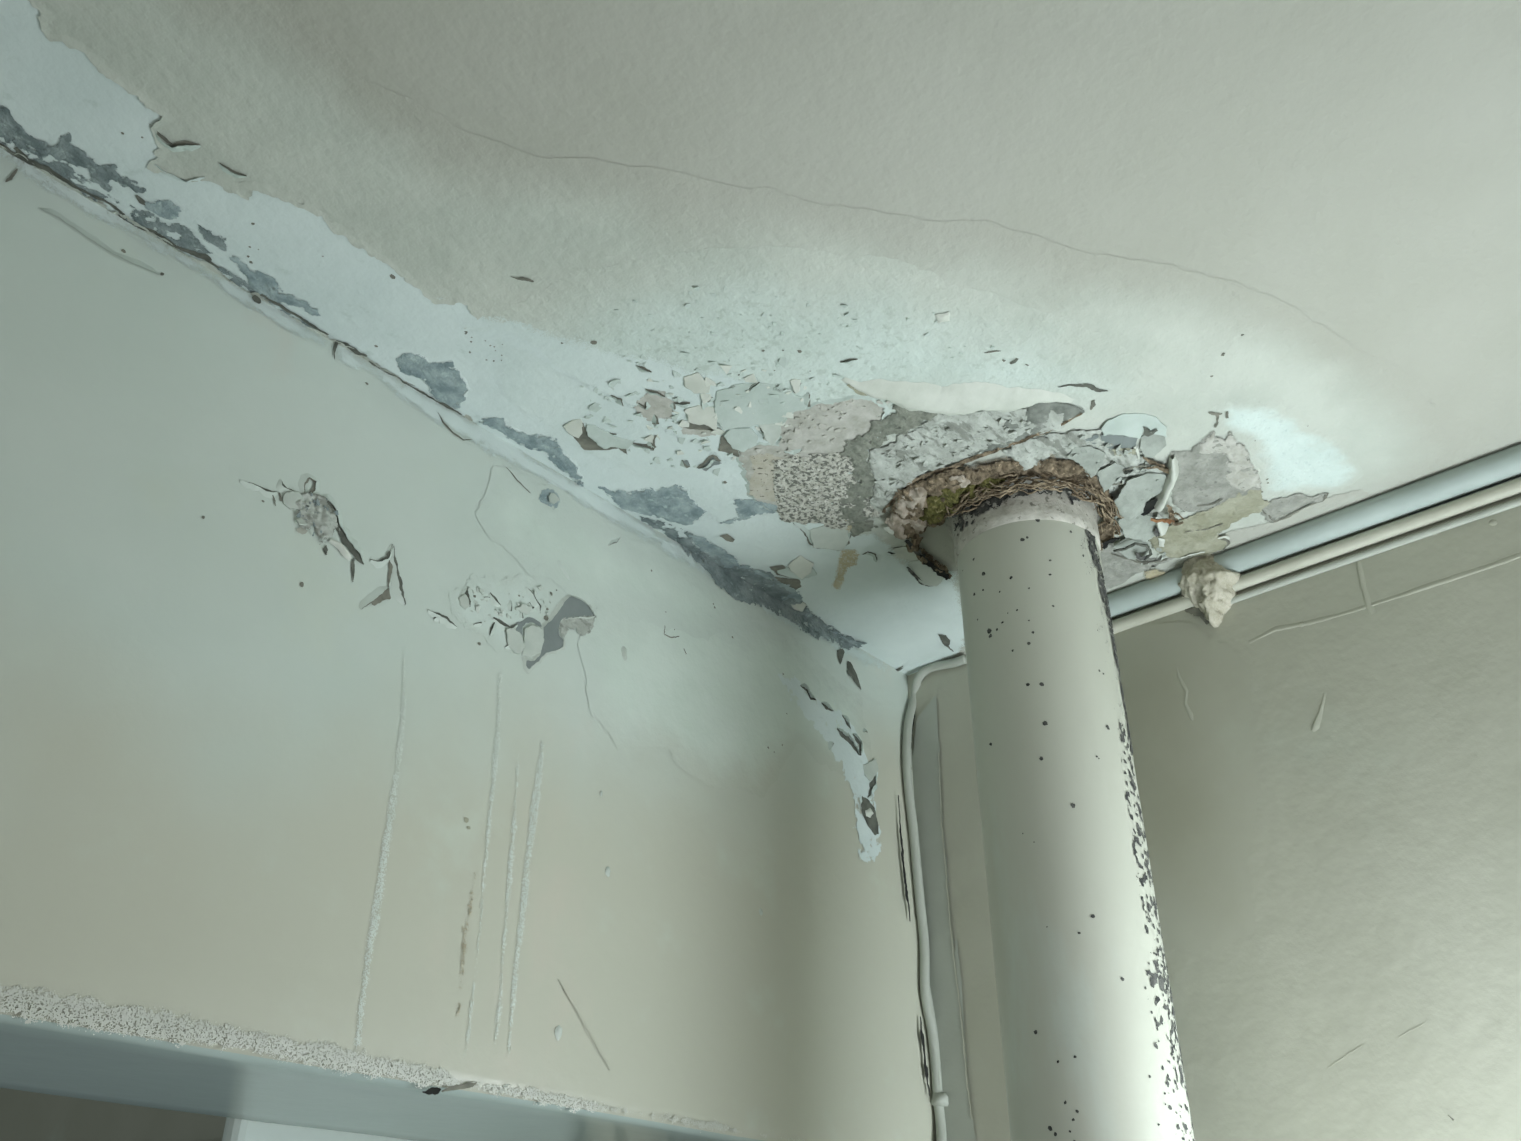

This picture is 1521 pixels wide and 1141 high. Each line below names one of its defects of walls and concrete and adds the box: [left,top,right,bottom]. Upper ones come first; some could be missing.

peeling [0,0,1370,689]
peeling [778,673,883,863]